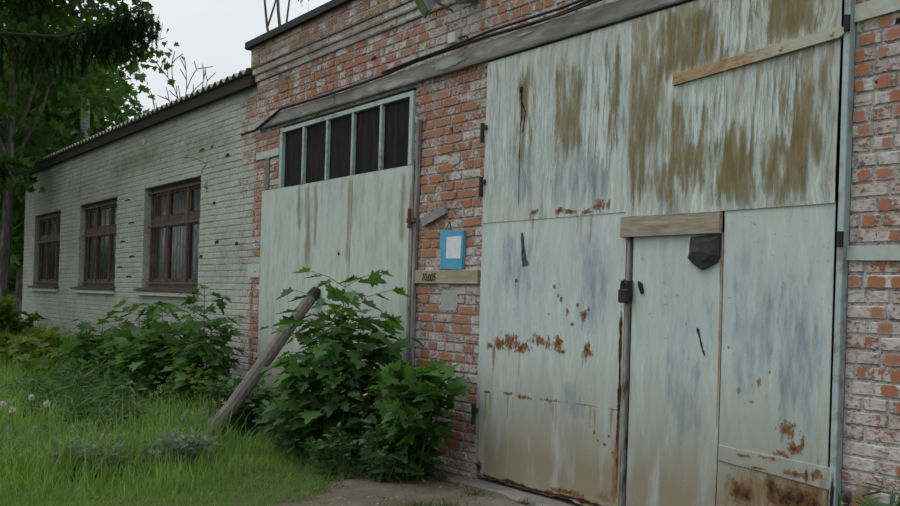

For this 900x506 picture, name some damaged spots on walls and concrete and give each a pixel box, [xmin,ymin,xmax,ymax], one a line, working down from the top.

damp [723,0,755,55]
peeling [854,13,900,116]
damp [582,52,616,173]
damp [687,78,726,149]
damp [747,54,796,153]
corrosion [555,199,610,214]
corrosion [553,285,590,326]
peeling [848,275,900,288]
peeling [870,306,893,334]
corrosion [475,312,623,506]
peeling [880,354,900,414]
corrosion [725,420,824,506]